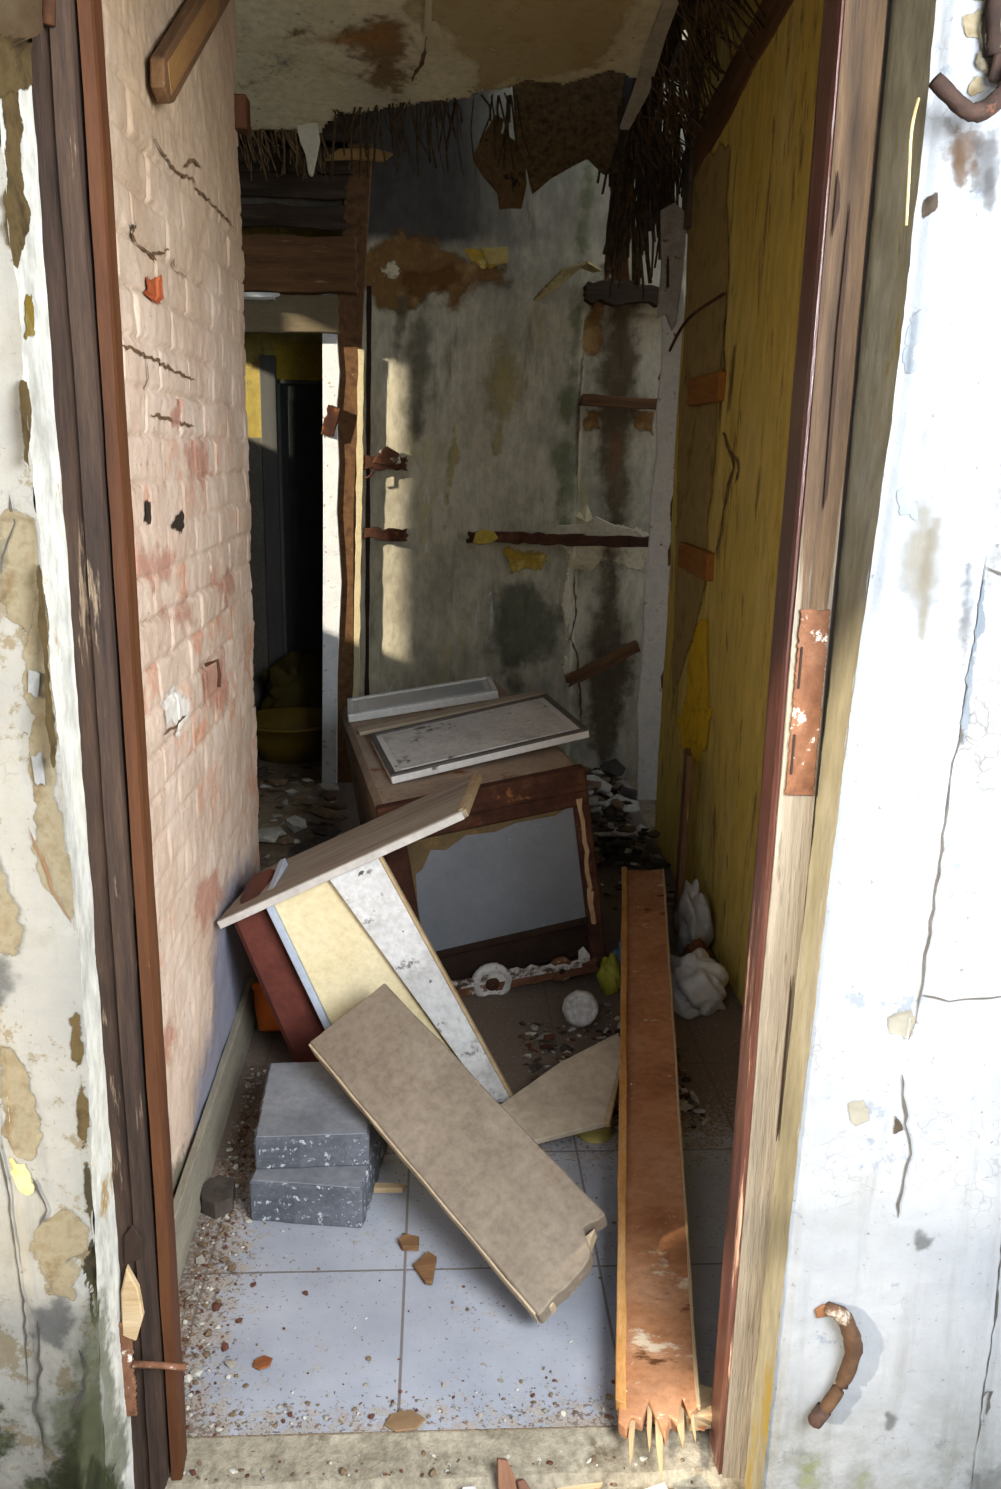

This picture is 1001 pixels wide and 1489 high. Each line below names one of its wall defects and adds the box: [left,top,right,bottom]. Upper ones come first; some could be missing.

leakage [336,17,413,93]
peeling [0,34,33,268]
peeling [24,294,35,339]
peeling [464,247,508,269]
peeling [19,380,32,465]
peeling [0,495,74,922]
leakage [478,585,558,696]
crack [908,557,1001,1040]
peeling [0,865,24,1001]
crack [897,1075,912,1218]
crack [972,1263,1001,1484]
leakage [86,1454,118,1489]